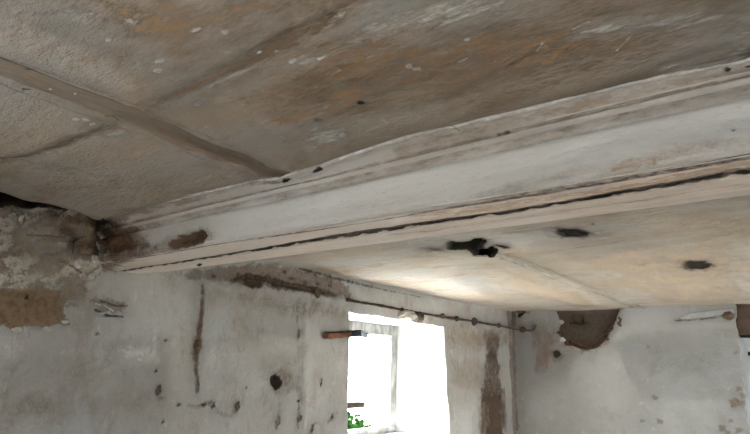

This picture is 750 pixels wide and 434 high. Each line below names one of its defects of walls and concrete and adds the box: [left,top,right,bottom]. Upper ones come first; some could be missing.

spalling [0,192,128,332]
spalling [169,230,208,250]
crack [115,154,750,271]
spalling [556,308,620,352]